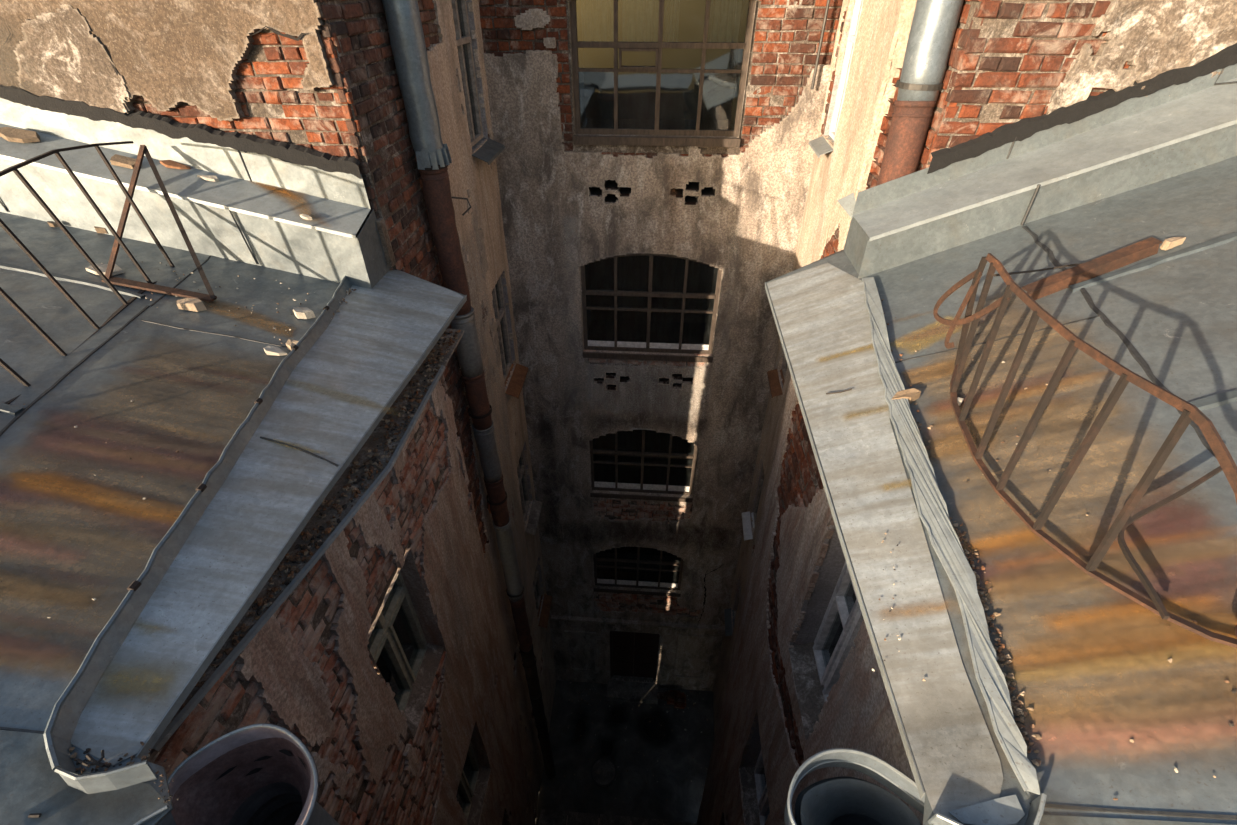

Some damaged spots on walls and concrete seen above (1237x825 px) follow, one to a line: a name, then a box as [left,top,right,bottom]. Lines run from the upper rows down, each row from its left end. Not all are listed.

spalling [13,4,368,163]
spalling [479,0,573,151]
spalling [601,0,843,158]
peeling [1046,0,1237,115]
rust [821,344,873,361]
rust [0,350,274,660]
spalling [593,499,692,524]
spalling [594,593,700,616]
spalling [768,404,824,766]
rust [892,297,1237,748]